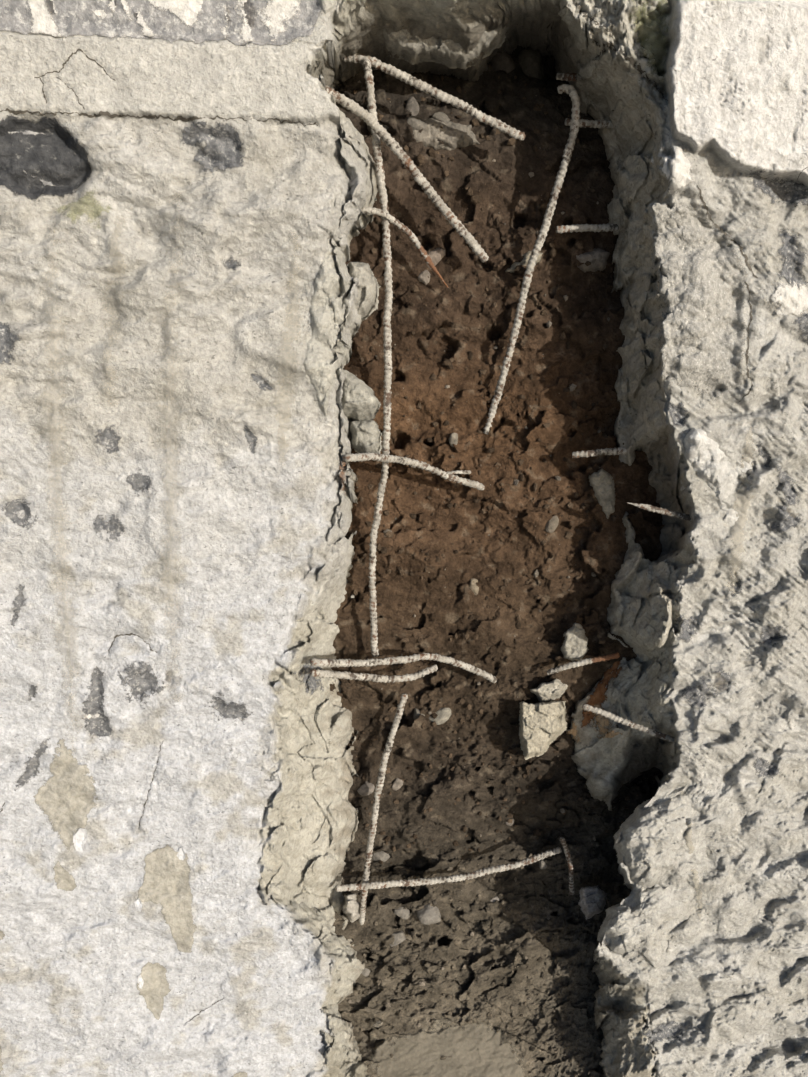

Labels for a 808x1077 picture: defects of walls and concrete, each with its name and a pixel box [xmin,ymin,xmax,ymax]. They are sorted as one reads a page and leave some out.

crack [0,49,318,127]
spalling [483,72,619,434]
crack [697,185,758,403]
spalling [293,53,575,925]
spalling [572,447,627,458]
spalling [627,502,692,522]
spalling [547,653,620,675]
corrosion [566,661,622,744]
spalling [582,704,675,742]
spalling [641,1020,690,1043]